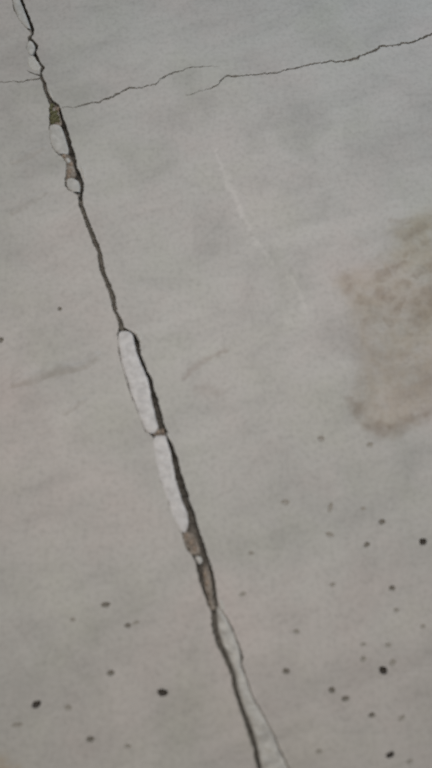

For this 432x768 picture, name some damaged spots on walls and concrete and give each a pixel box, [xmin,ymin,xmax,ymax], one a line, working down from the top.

crack [0,0,289,768]
damp [324,196,432,446]